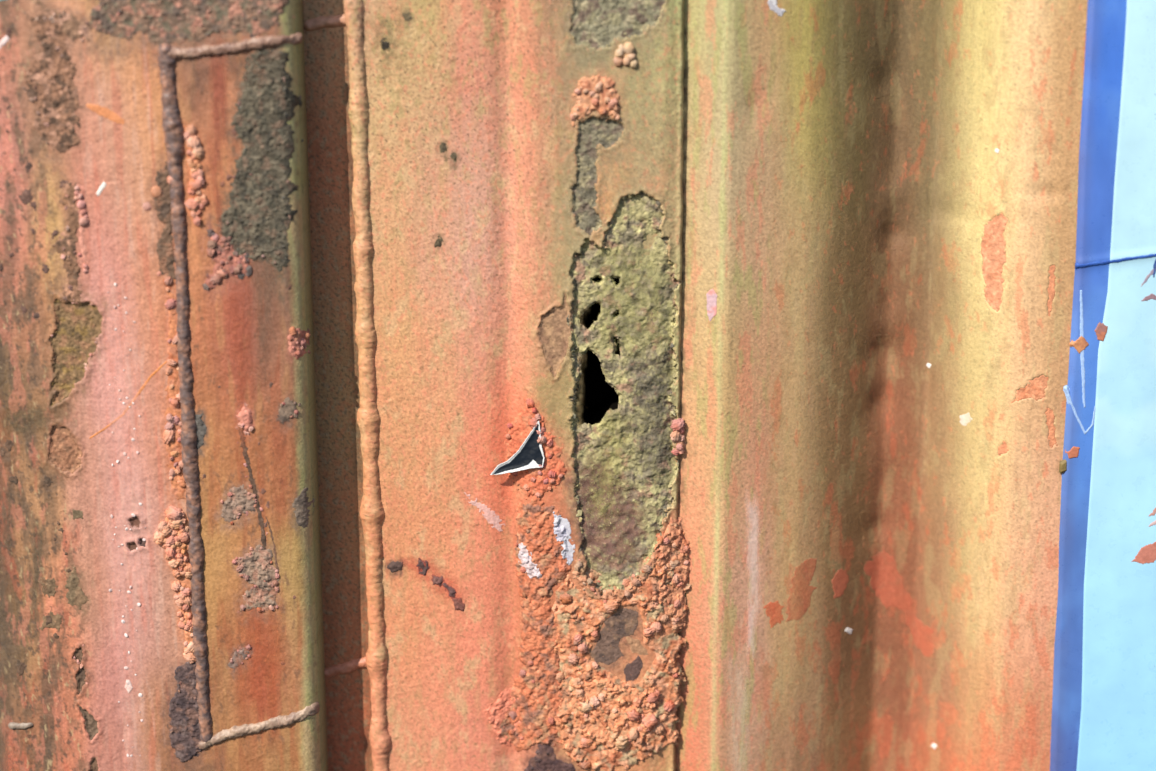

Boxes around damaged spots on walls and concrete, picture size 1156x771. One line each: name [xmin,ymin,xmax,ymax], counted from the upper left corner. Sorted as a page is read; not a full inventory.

rust [18,188,37,211]
rust [22,0,304,762]
rust [483,0,691,771]
peeling [980,213,1008,312]